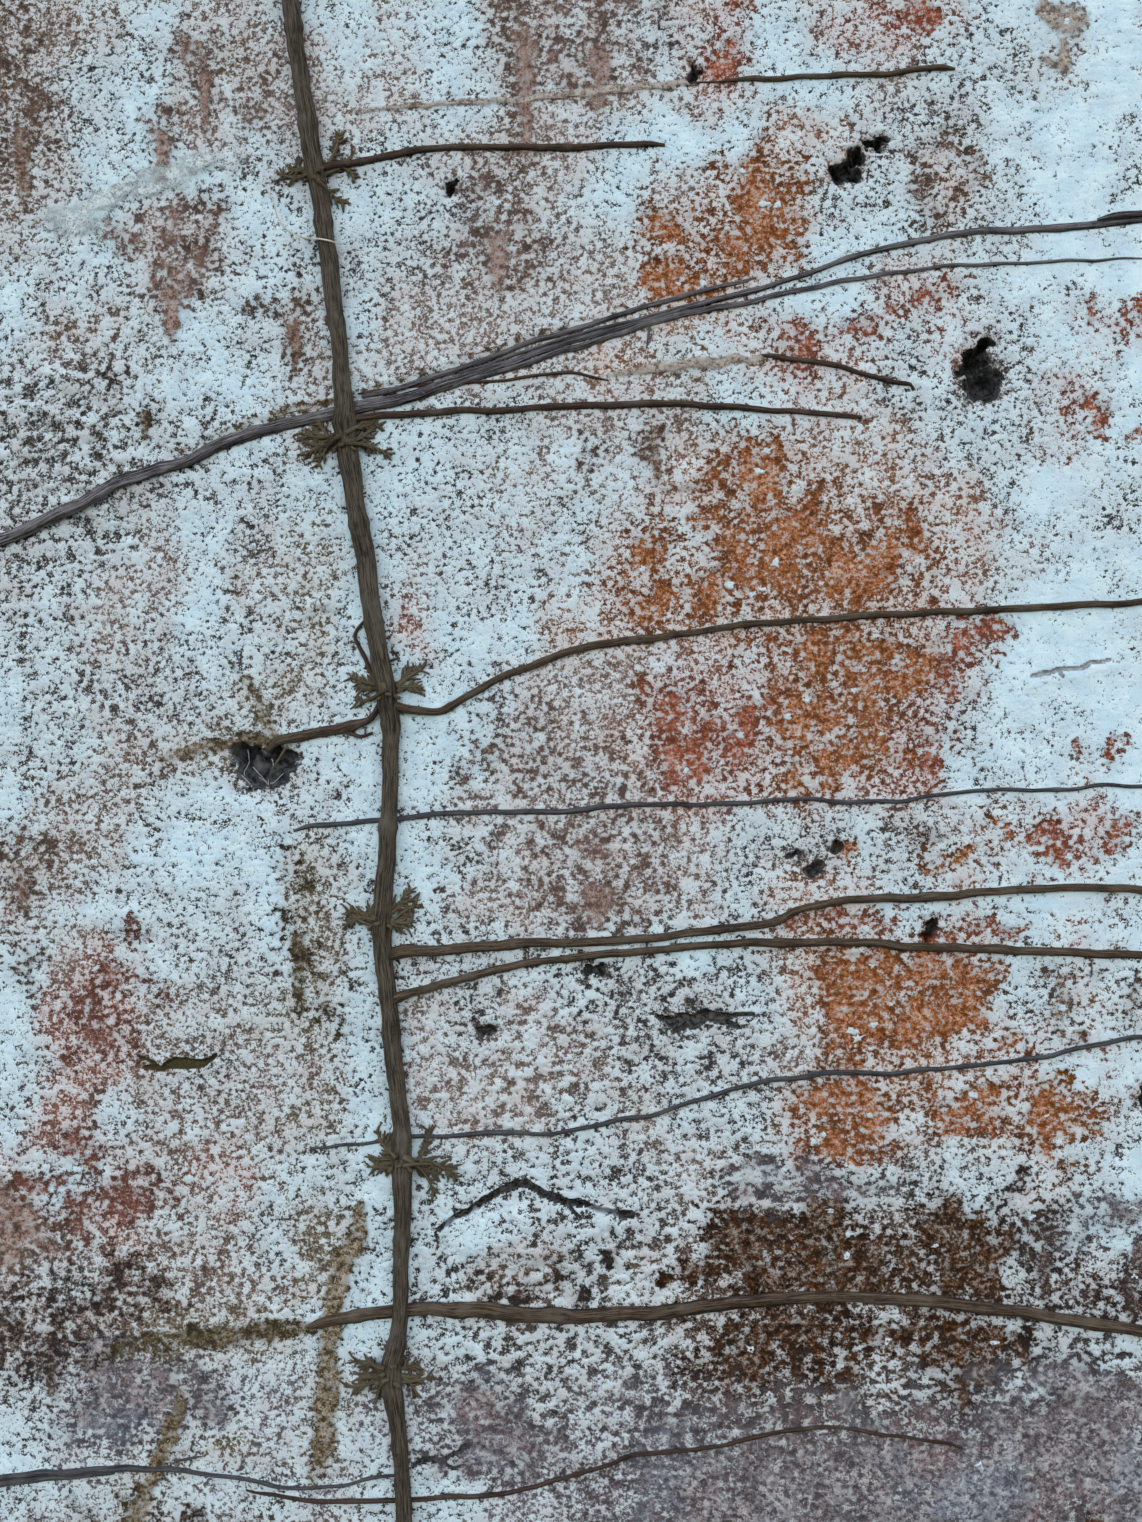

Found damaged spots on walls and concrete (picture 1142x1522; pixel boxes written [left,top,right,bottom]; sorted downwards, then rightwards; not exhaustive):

crack [655,1008,755,1034]
crack [139,1053,217,1072]
crack [436,1178,636,1232]